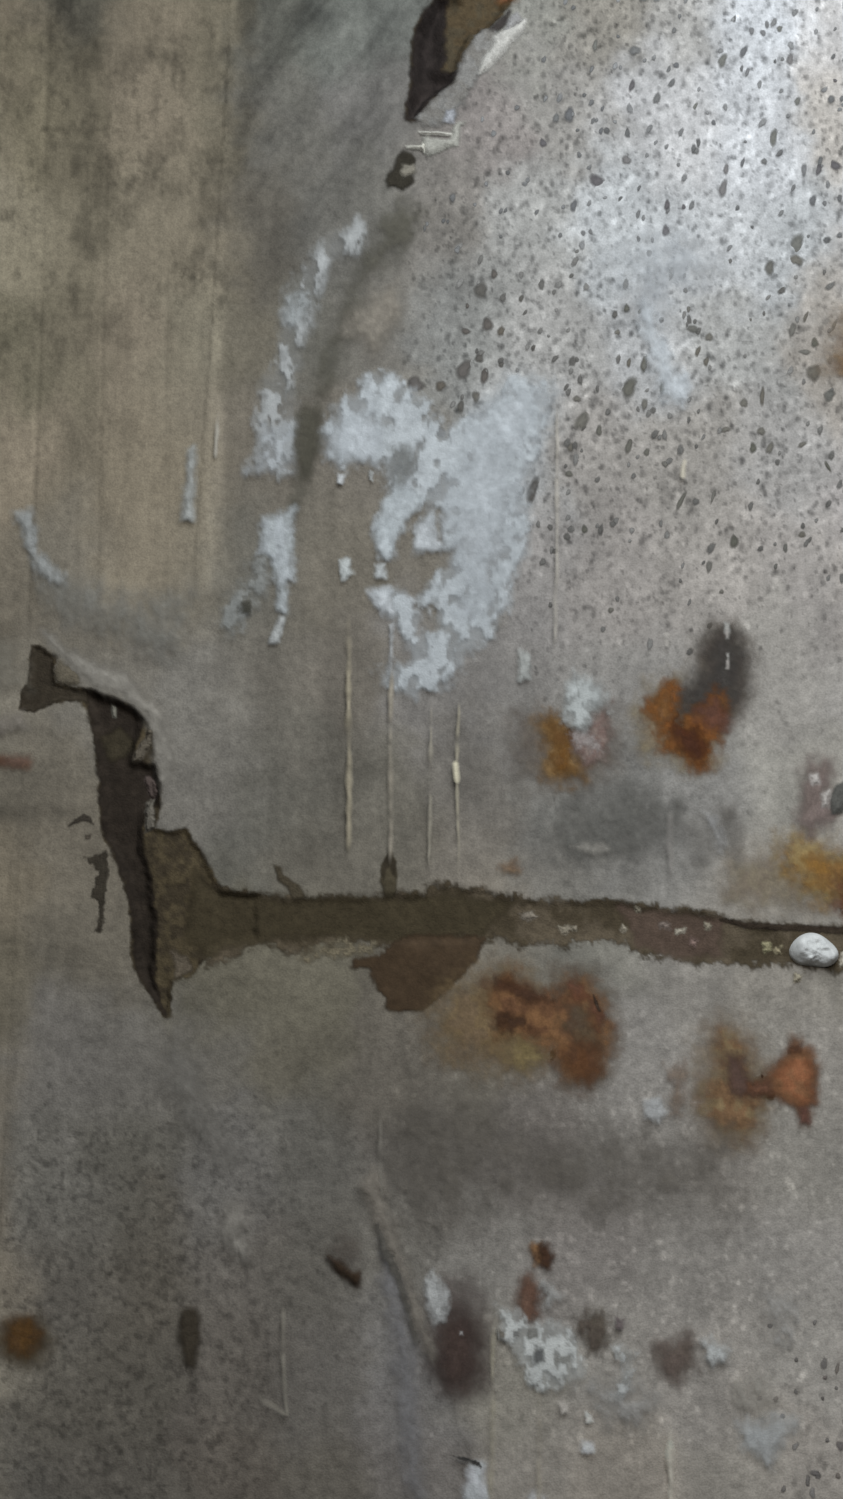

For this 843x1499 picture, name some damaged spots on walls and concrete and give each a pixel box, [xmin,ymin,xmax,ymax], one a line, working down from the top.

spalling [386,0,527,189]
spalling [544,35,700,182]
spalling [719,10,798,88]
spalling [719,89,800,211]
leakage [340,210,414,265]
leakage [254,247,547,691]
leakage [223,503,297,643]
corrosion [640,622,750,772]
crack [70,814,109,932]
crack [186,865,843,982]
corrosion [439,968,614,1083]
corrosion [696,1028,819,1140]